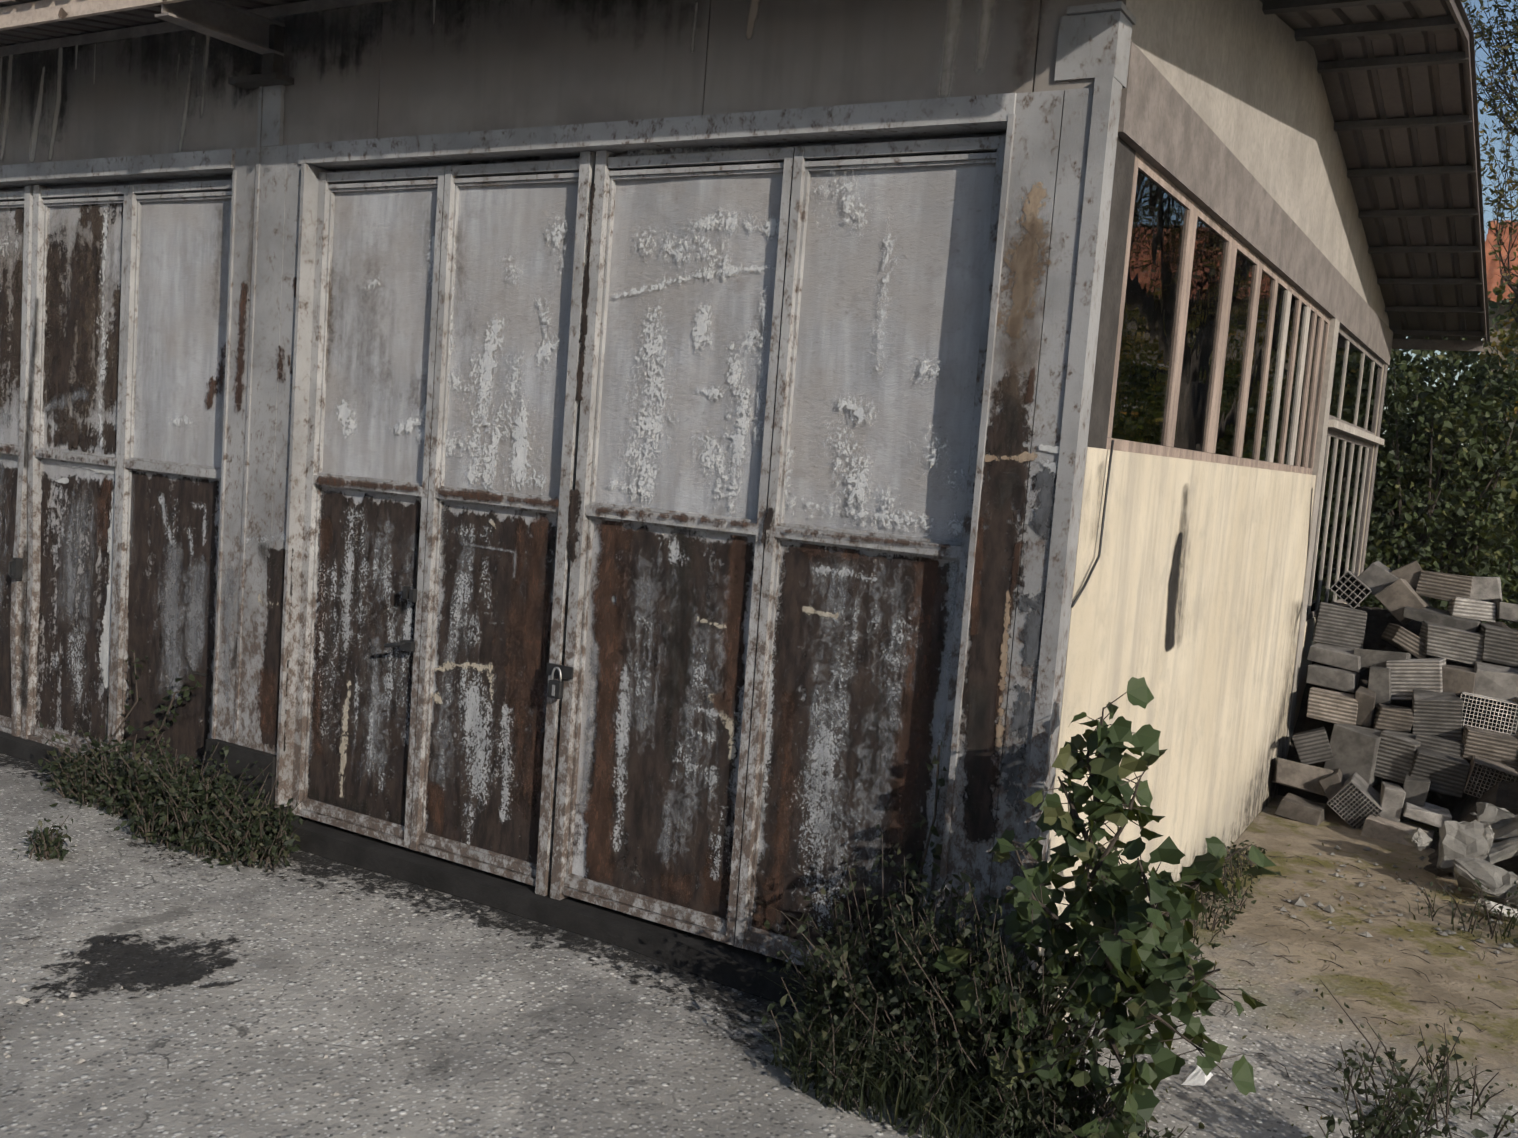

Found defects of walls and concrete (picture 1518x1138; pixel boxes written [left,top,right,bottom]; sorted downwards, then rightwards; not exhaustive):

leakage [0,55,13,161]
leakage [29,43,96,162]
corrosion [0,203,238,774]
corrosion [168,276,251,429]
corrosion [245,530,294,752]
corrosion [308,475,421,826]
peeling [445,251,561,495]
peeling [543,214,568,274]
peeling [608,207,780,517]
corrosion [425,182,1051,965]
peeling [784,394,967,539]
leakage [18,930,245,1011]